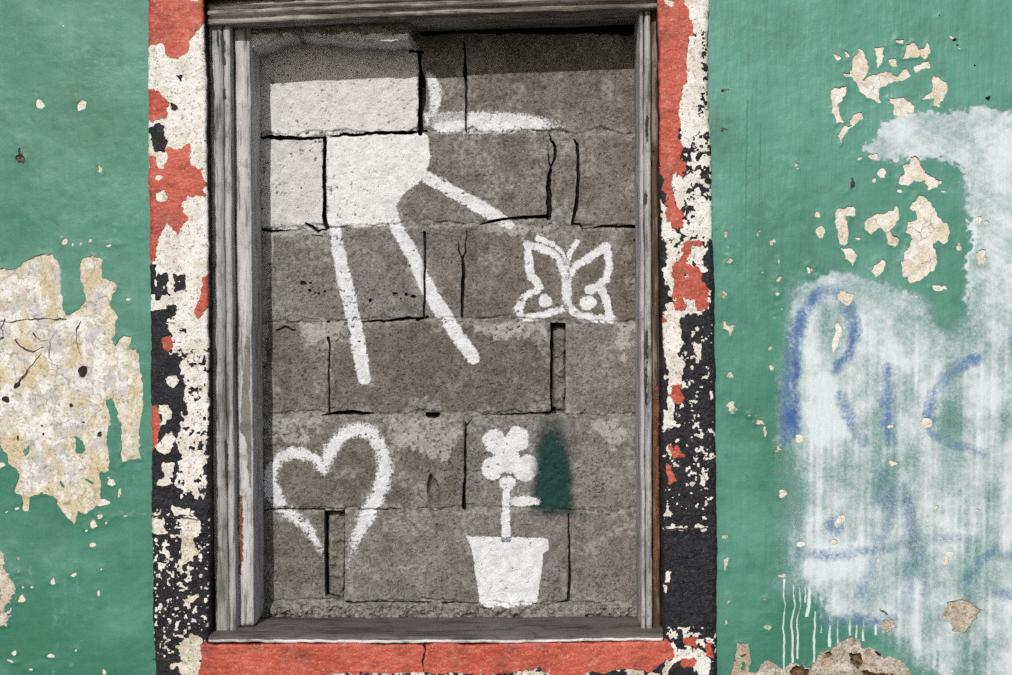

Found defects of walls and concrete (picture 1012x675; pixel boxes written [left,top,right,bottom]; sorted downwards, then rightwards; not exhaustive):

peeling [830,39,947,143]
peeling [660,0,736,532]
peeling [815,153,962,291]
peeling [0,254,143,547]
peeling [148,24,226,675]
spalling [427,473,441,505]
peeling [617,626,716,675]
spalling [731,637,911,675]